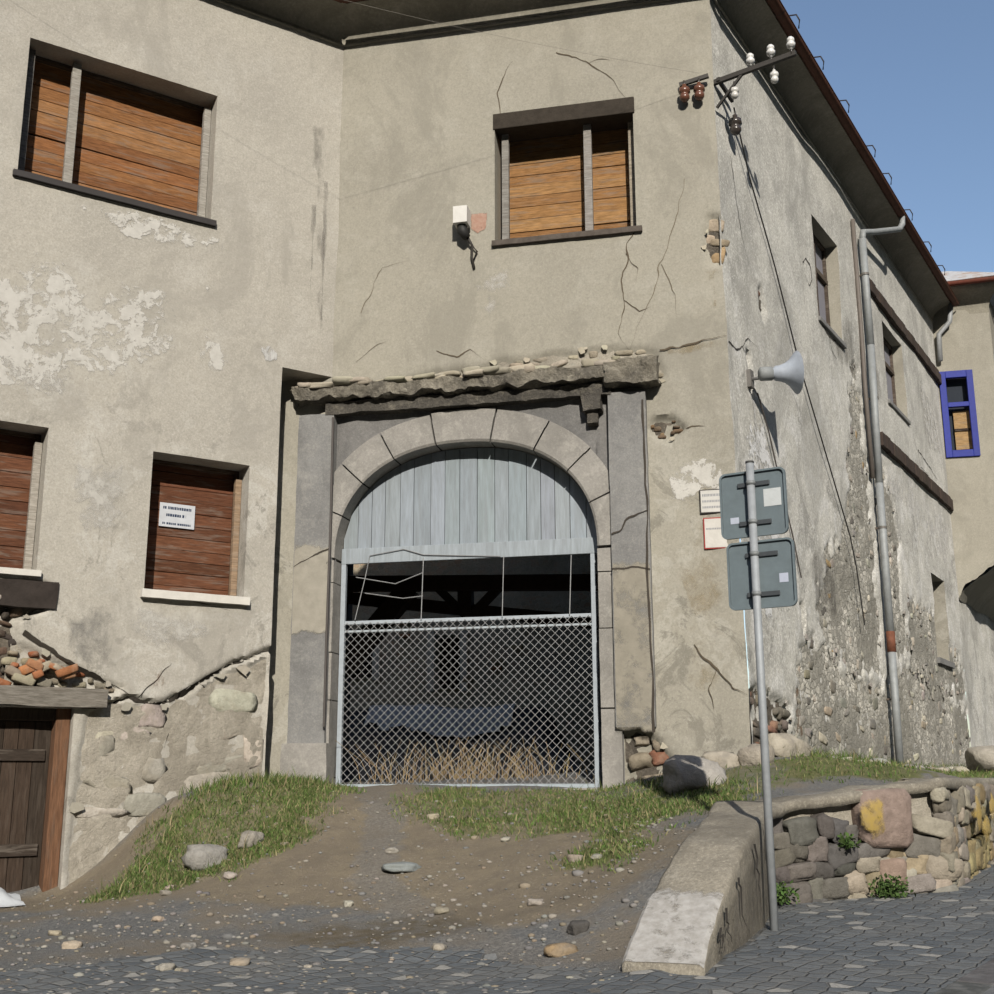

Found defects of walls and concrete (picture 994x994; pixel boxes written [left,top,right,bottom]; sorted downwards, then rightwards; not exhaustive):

crack [556,52,625,97]
peeling [105,210,219,247]
crack [618,189,684,347]
flaking render [701,219,730,267]
peeling [0,262,172,395]
crack [660,335,755,354]
flaking render [651,420,683,441]
peeling [669,458,722,501]
crack [611,399,655,732]
flaking render [747,364,970,768]
crack [22,630,269,741]
flaking render [0,607,266,884]